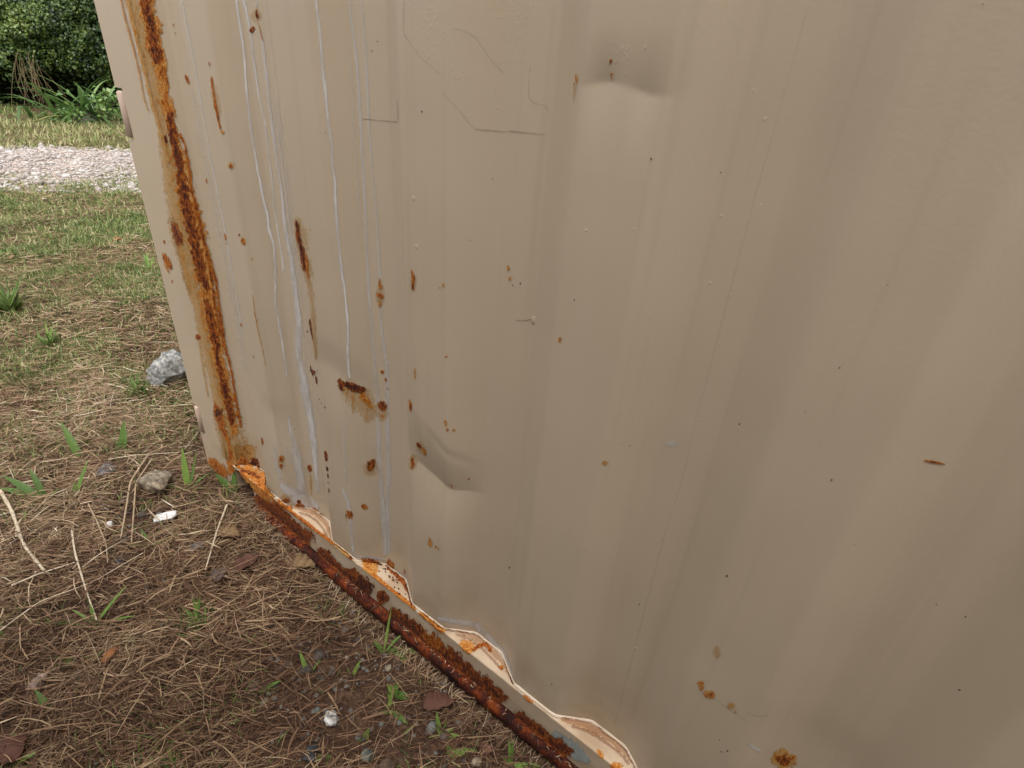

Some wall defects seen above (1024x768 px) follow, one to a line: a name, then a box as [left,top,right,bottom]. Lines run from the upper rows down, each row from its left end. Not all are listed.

leakage [235,0,319,510]
leakage [315,0,351,379]
corrosion [120,0,574,759]
peeling [552,730,590,764]
corrosion [697,681,716,699]
corrosion [770,748,797,768]